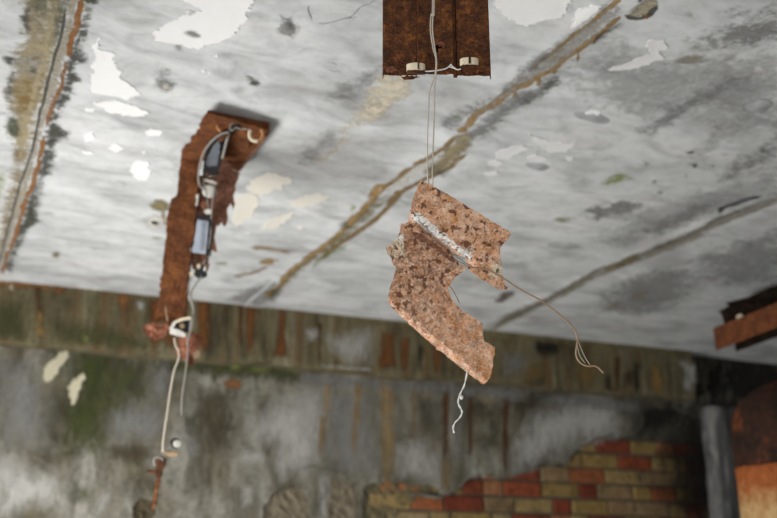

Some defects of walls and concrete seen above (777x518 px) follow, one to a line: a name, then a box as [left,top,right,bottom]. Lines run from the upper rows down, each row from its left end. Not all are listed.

corrosion [46,0,85,125]
peeling [85,37,150,117]
peeling [152,0,254,50]
crack [307,1,374,24]
corrosion [265,0,621,298]
corrosion [0,137,63,308]
corrosion [235,246,290,278]
peeling [43,351,69,382]
peeling [67,373,86,405]
damp [248,377,375,476]
damp [374,382,636,470]
damp [0,457,56,513]